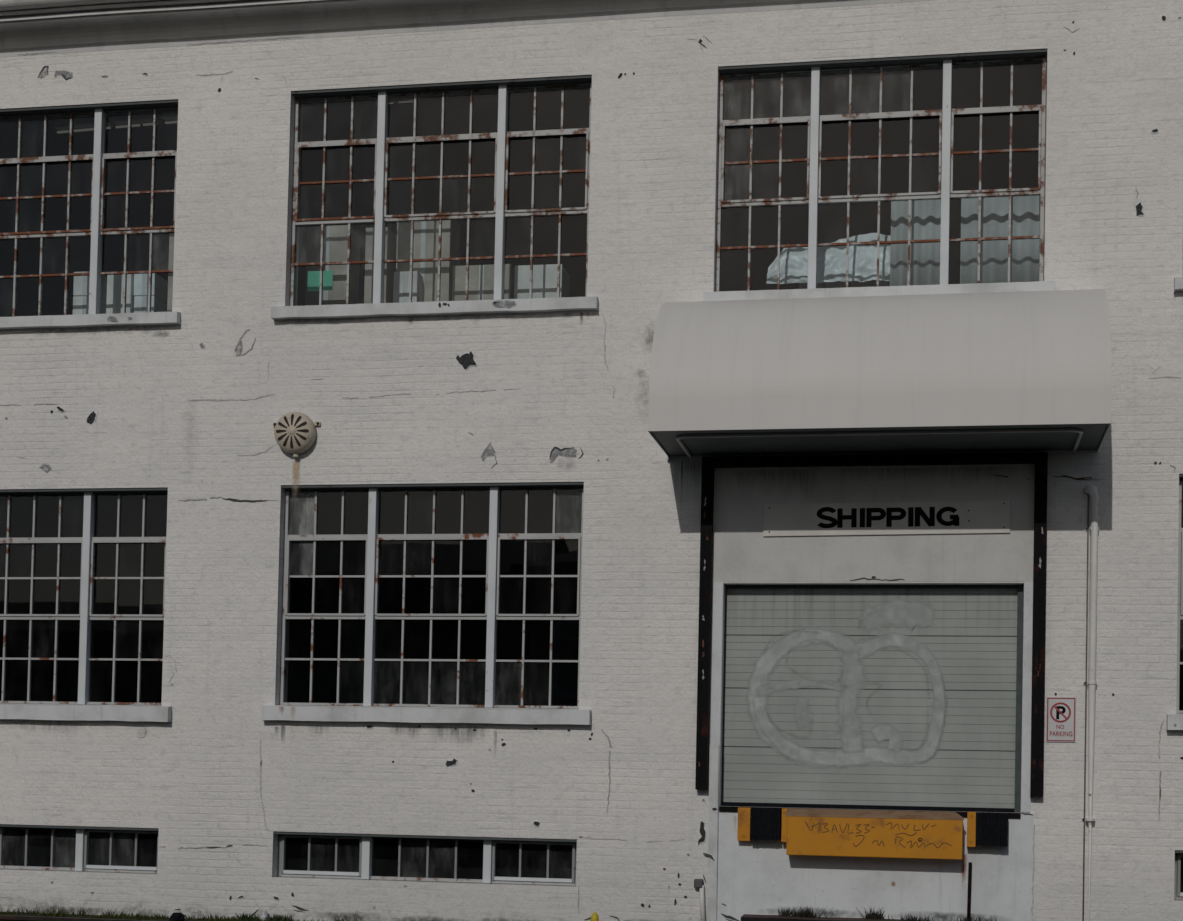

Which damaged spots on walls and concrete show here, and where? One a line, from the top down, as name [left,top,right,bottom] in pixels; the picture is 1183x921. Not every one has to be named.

peeling [38,66,72,80]
spalling [456,350,477,370]
peeling [550,447,584,463]
crack [178,495,278,503]